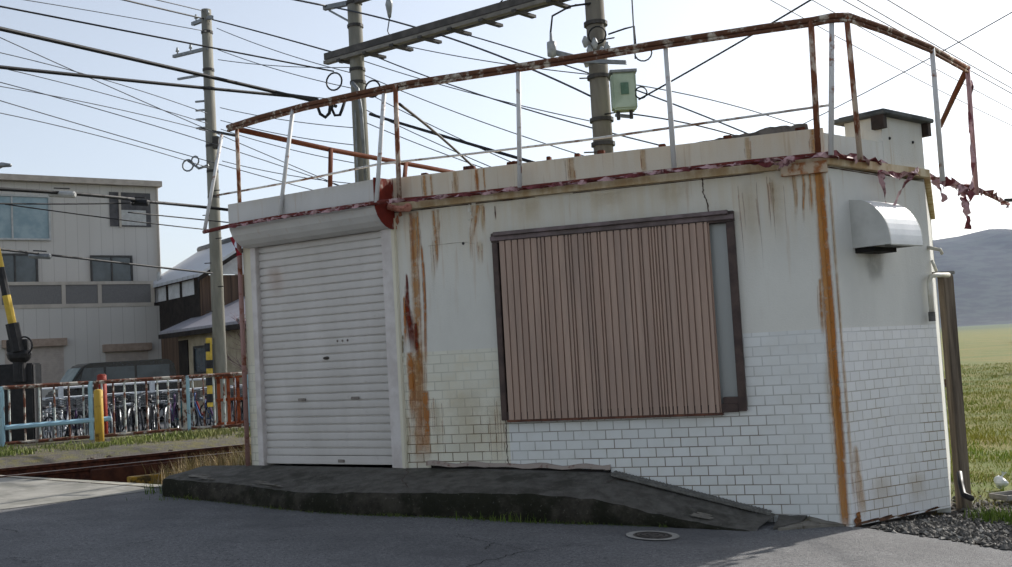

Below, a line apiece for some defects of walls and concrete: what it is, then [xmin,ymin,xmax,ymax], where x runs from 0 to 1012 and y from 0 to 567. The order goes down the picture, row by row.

crack [394,197,534,213]
crack [575,173,760,211]
rust [404,213,429,442]
rust [802,173,848,520]